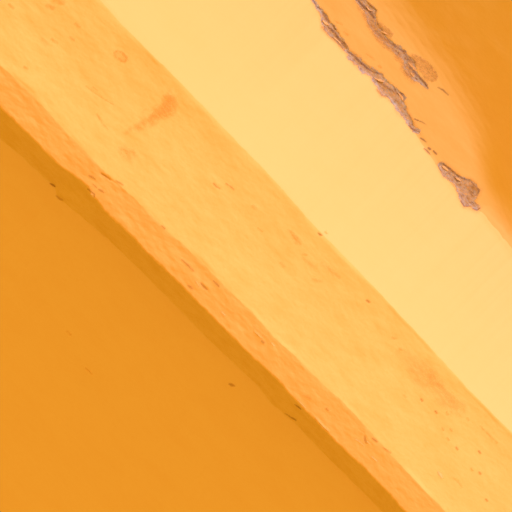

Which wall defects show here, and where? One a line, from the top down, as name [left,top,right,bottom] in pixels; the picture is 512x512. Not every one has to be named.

peeling [312,0,435,140]
peeling [438,163,480,210]